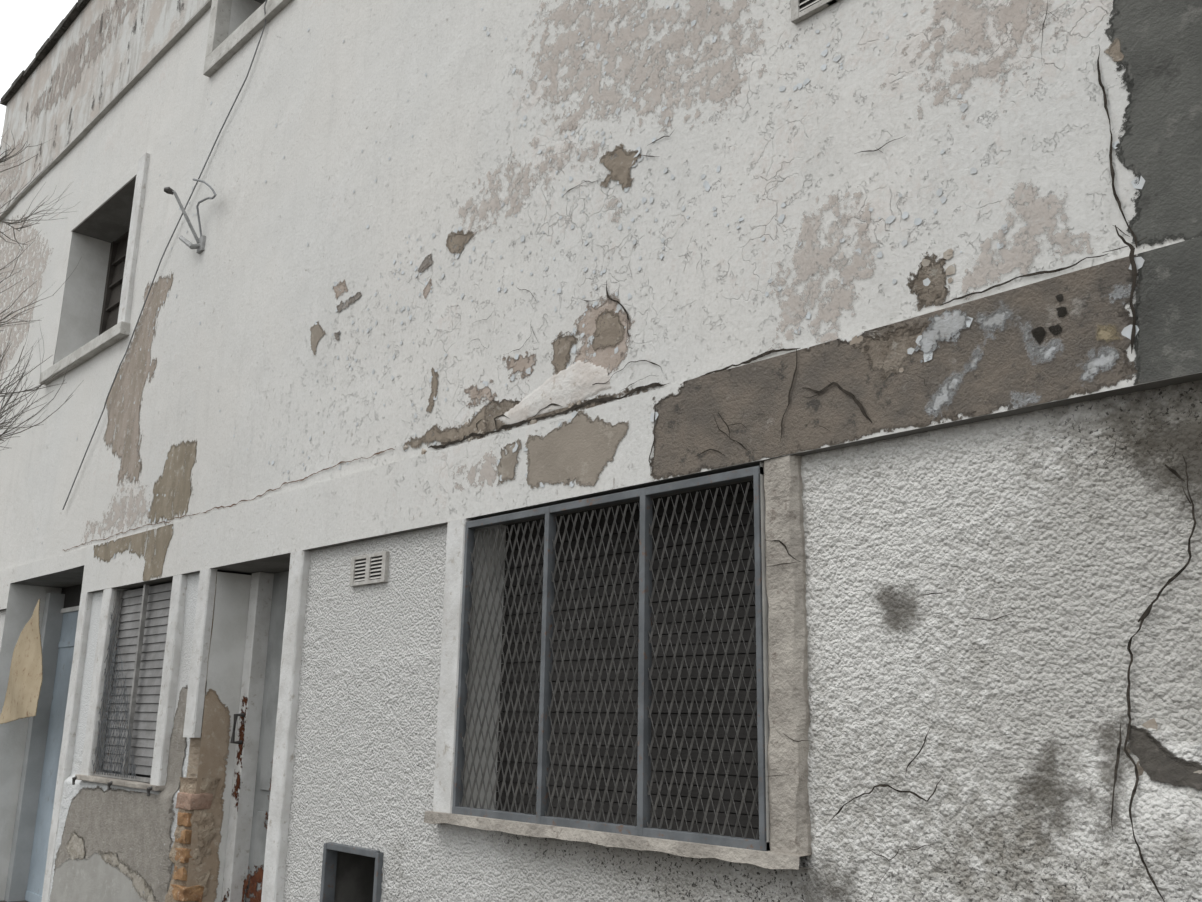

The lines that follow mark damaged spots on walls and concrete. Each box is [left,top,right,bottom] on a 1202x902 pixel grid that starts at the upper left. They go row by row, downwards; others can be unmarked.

spalling [380,226,502,298]
crack [941,47,1147,354]
peeling [103,272,177,484]
crack [428,280,872,475]
peeling [93,440,197,581]
crack [63,448,395,551]
spalling [49,686,231,902]
crack [1111,455,1196,902]
spalling [1123,718,1202,790]